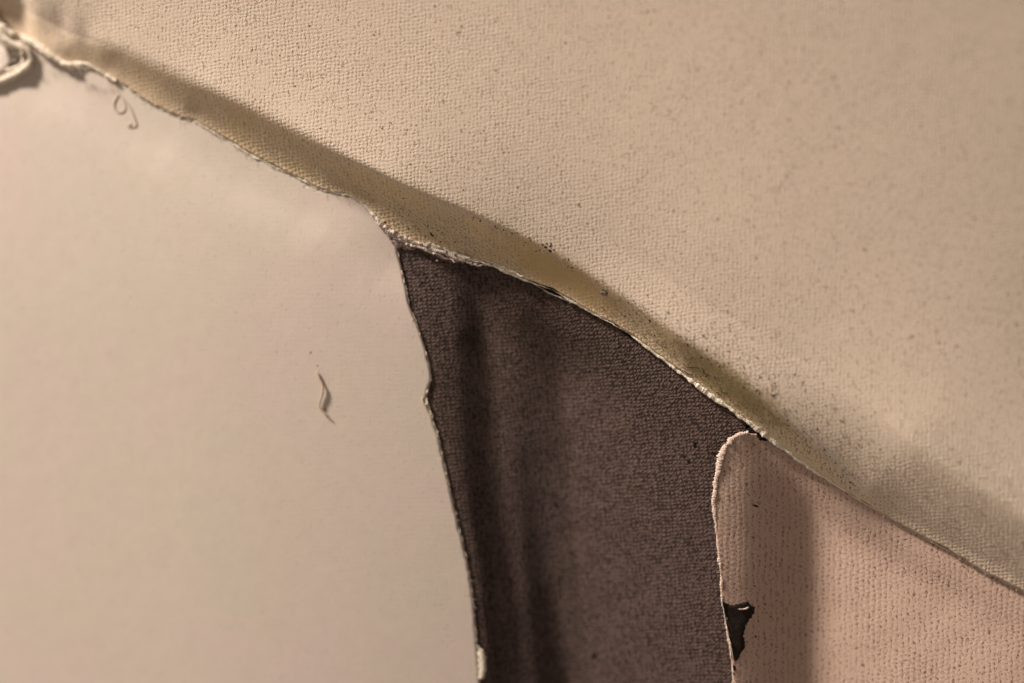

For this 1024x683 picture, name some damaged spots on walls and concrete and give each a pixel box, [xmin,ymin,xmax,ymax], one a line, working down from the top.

spalling [372,216,530,279]
peeling [477,646,487,679]
peeling [721,598,755,671]